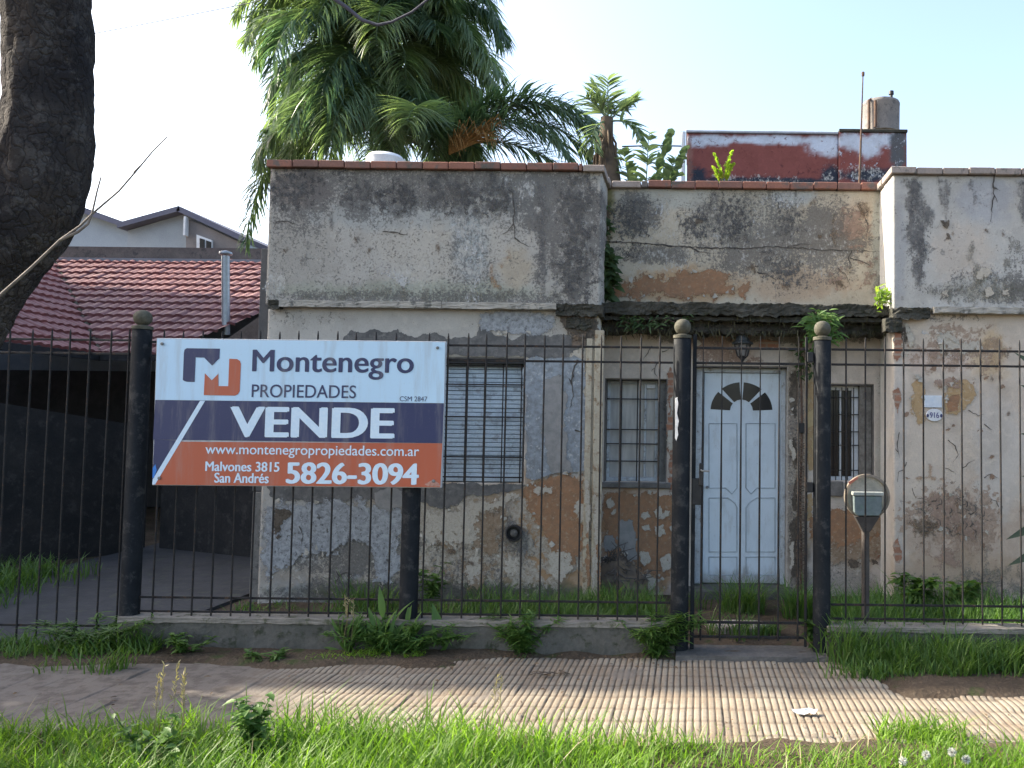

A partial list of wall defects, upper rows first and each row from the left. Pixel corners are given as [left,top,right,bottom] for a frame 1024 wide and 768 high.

water stain [263,168,663,346]
crack [501,190,529,247]
peeling [614,269,750,303]
crack [607,205,879,284]
water stain [677,191,837,296]
water stain [905,179,950,286]
peeling [892,367,989,431]
peeling [420,367,673,598]
peeling [258,494,402,589]
peeling [831,506,902,568]